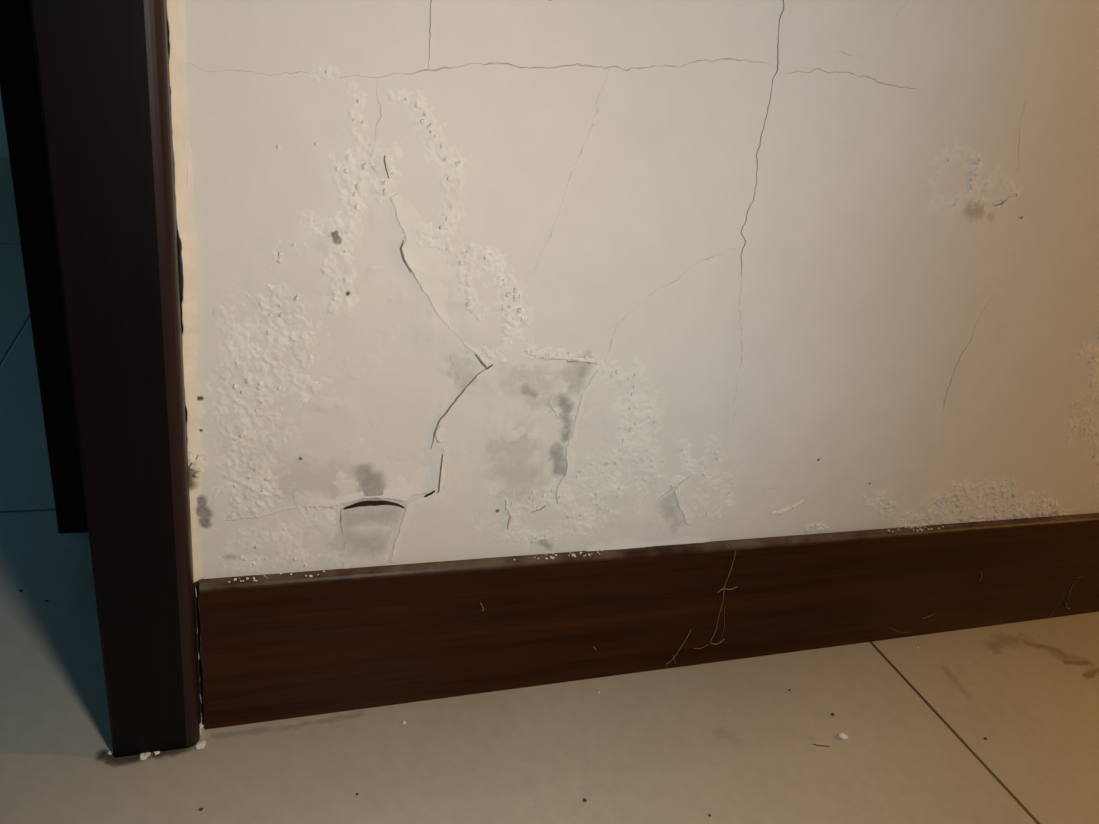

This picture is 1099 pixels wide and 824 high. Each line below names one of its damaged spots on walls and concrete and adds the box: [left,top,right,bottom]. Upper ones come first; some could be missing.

crack [186,0,915,422]
flaking render [188,452,211,527]